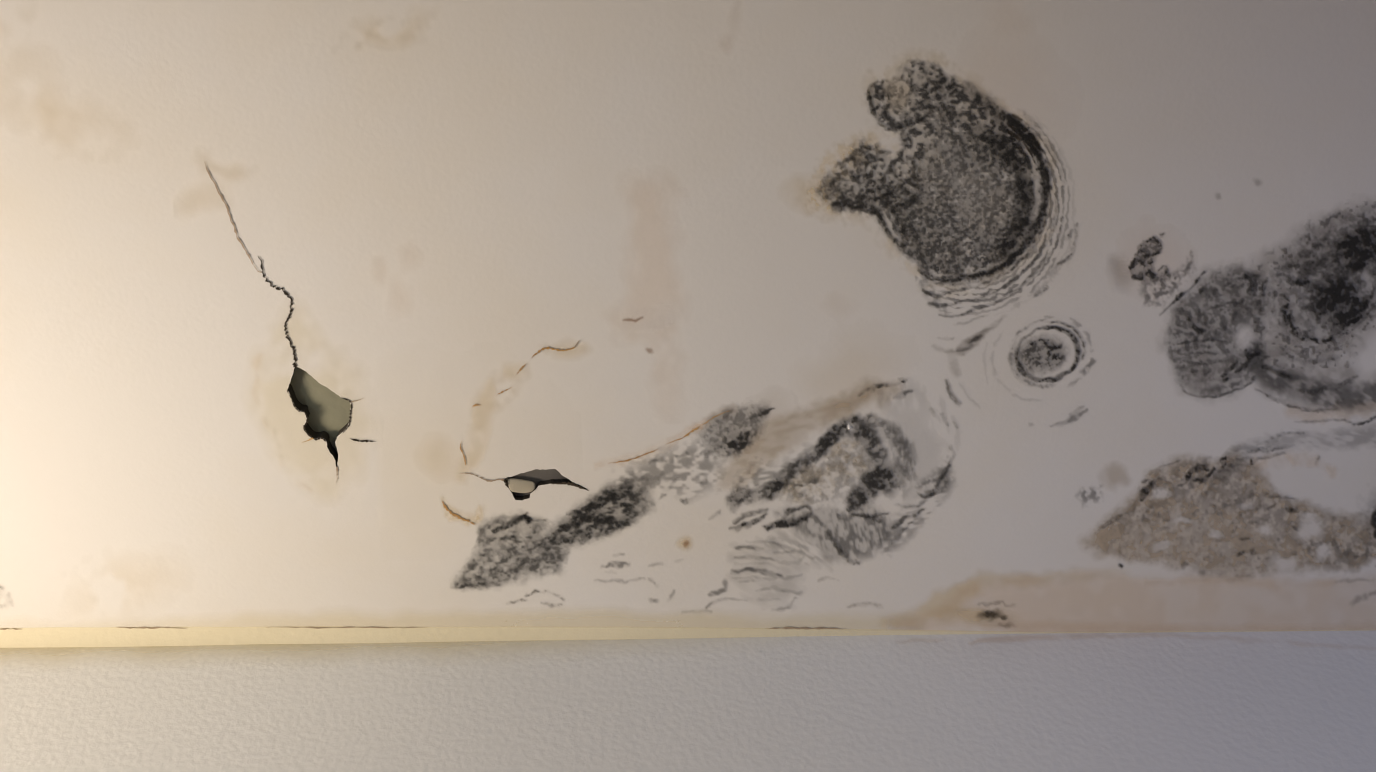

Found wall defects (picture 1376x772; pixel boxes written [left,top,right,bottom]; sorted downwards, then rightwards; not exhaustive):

water stain [820,62,1050,307]
crack [204,162,297,367]
water stain [1015,322,1085,382]
water stain [1128,234,1169,280]
water stain [1172,271,1297,396]
water stain [1282,225,1376,343]
spalling [287,367,376,483]
peeling [460,469,589,500]
water stain [457,486,641,588]
water stain [723,395,948,553]
water stain [1095,457,1313,568]
water stain [1325,511,1376,564]